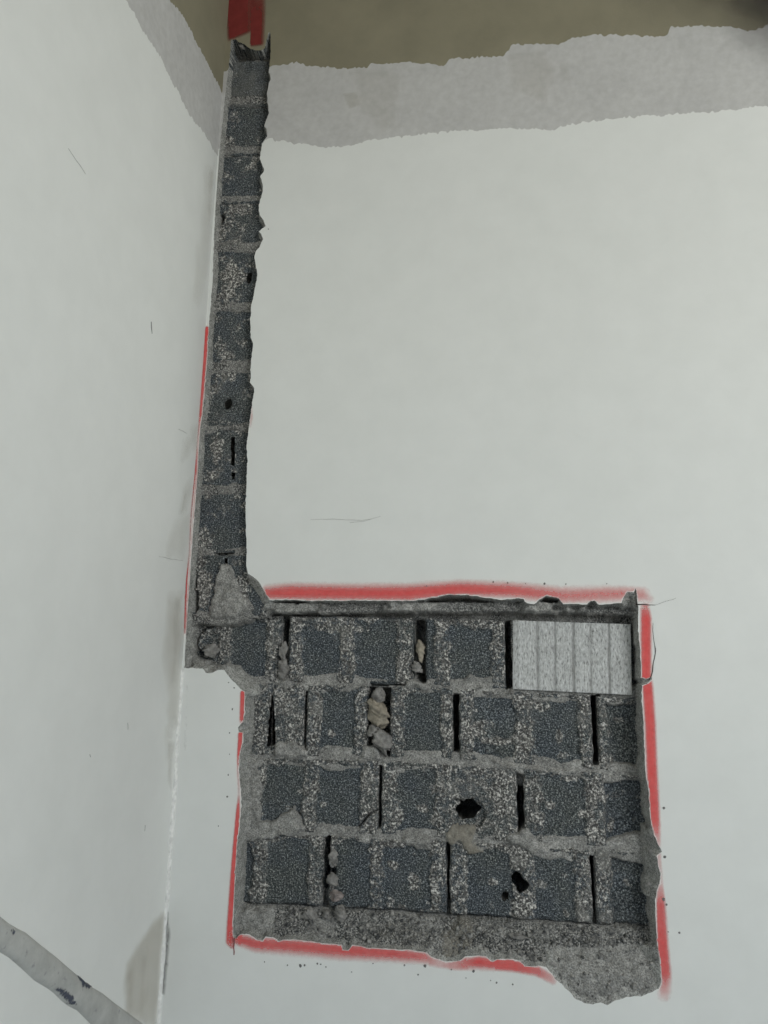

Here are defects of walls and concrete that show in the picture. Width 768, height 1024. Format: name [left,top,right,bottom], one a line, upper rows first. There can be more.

flaking render [184,33,662,1005]